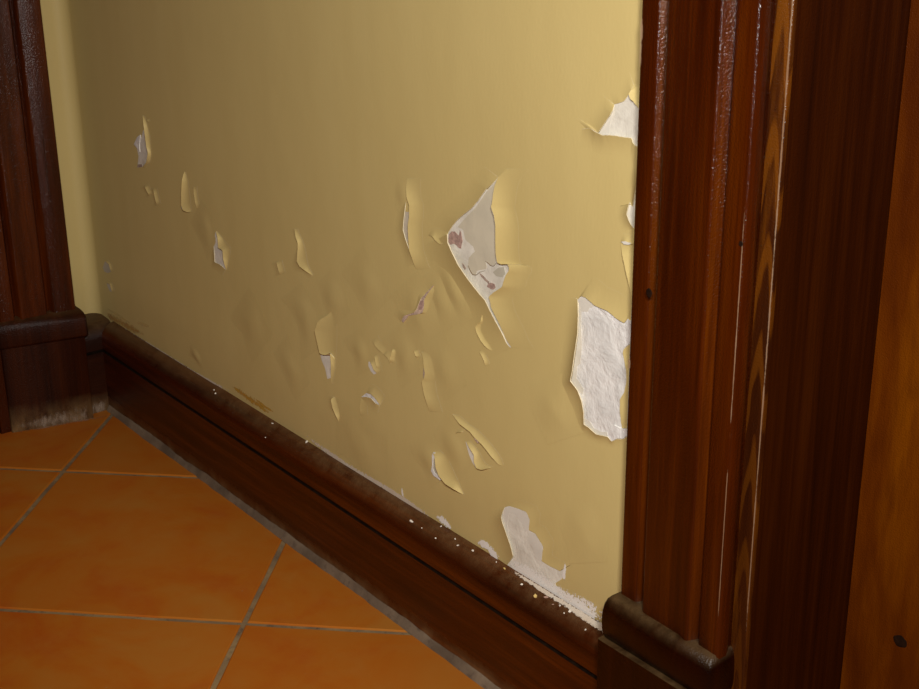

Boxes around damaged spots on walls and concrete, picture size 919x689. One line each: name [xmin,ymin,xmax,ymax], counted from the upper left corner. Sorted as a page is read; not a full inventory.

peeling [134,115,151,168]
peeling [211,231,231,275]
peeling [396,167,533,366]
peeling [560,72,639,447]
peeling [315,312,337,384]
peeling [431,450,464,494]
peeling [452,414,504,470]
peeling [489,500,571,586]